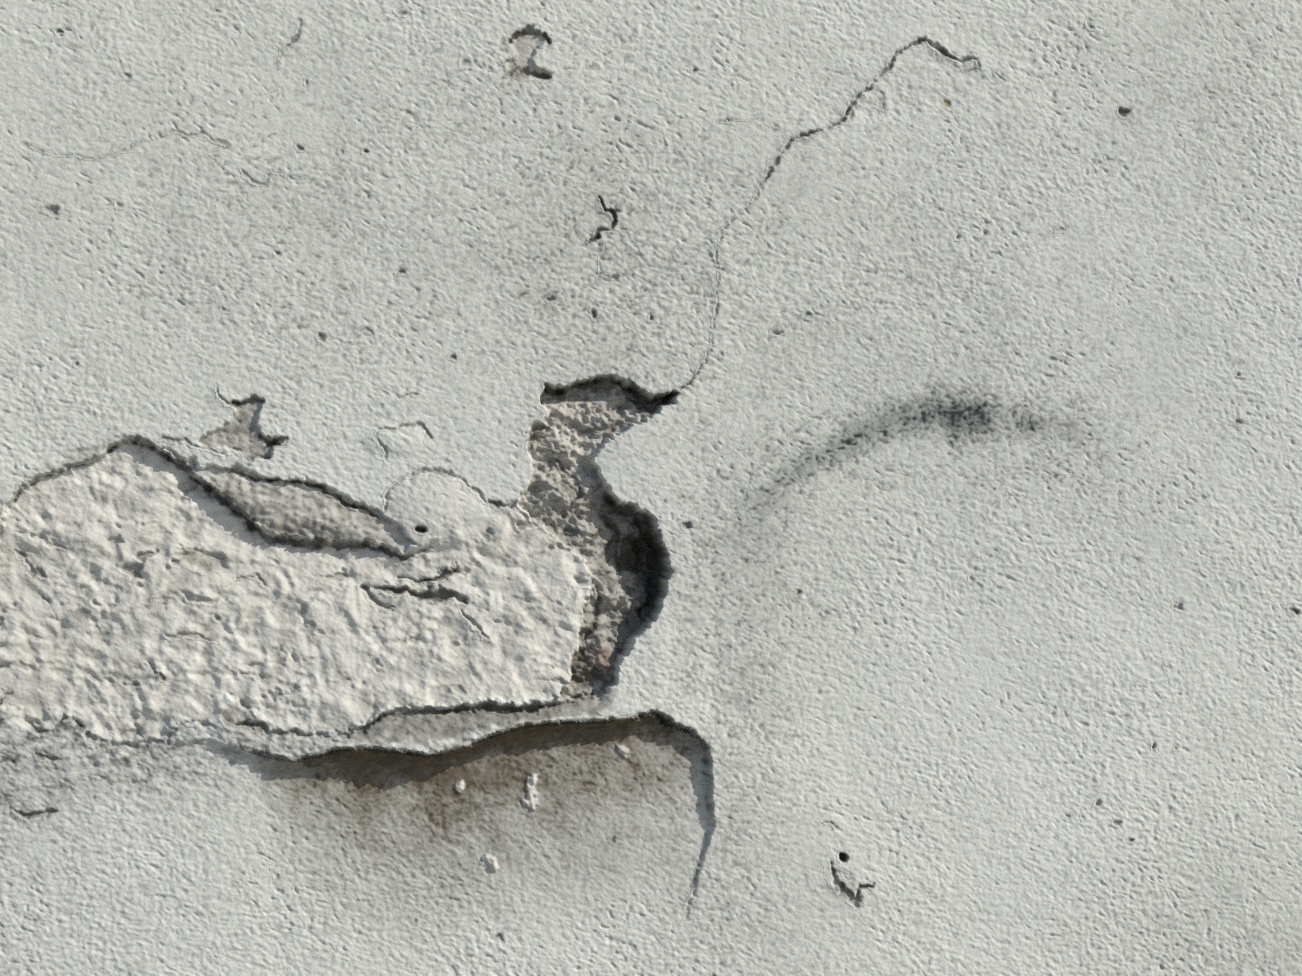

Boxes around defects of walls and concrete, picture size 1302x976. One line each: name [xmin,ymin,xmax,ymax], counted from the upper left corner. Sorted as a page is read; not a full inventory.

peeling [502,2,555,84]
crack [586,193,629,281]
crack [677,34,1007,391]
spalling [680,520,693,530]
flaking render [0,370,681,765]
peeling [11,806,60,822]
peeling [819,819,841,830]
peeling [824,851,877,910]
spalling [492,932,507,943]